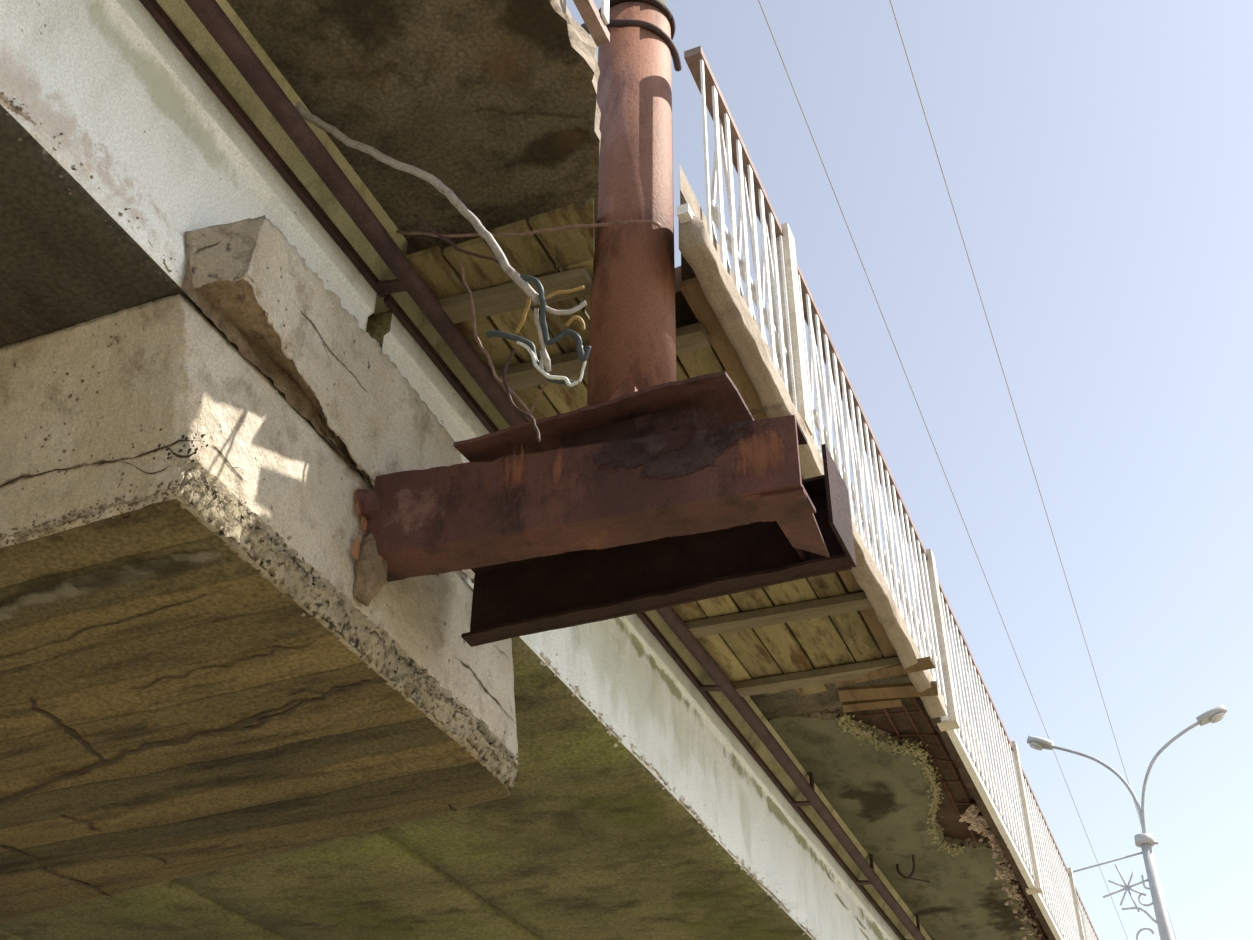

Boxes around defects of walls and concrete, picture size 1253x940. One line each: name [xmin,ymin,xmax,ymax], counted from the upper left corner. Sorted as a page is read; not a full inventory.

leakage [502,0,571,51]
leakage [508,129,588,166]
crack [192,241,220,255]
crack [293,301,367,392]
crack [0,428,249,488]
crack [312,414,372,489]
rust [593,421,784,481]
leakage [0,552,218,620]
spalling [835,697,1049,940]